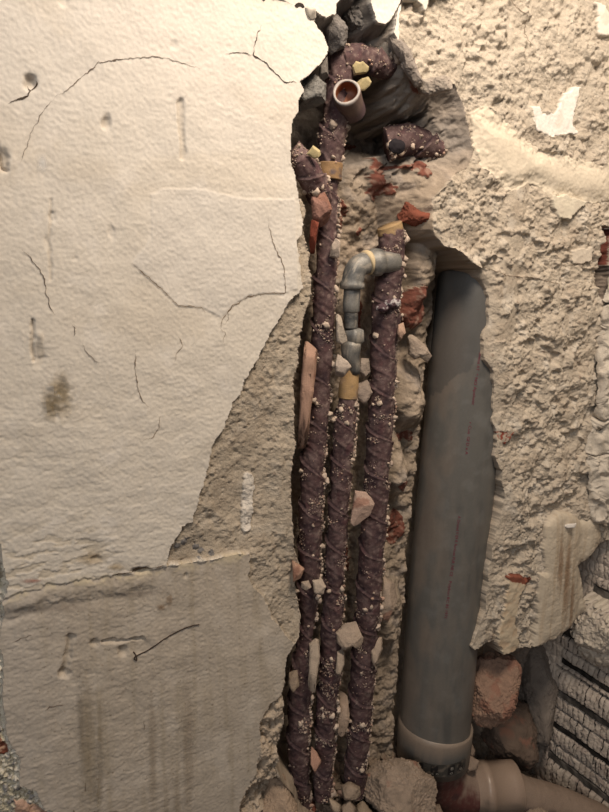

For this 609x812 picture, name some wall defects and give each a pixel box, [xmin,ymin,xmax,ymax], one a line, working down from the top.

crack [8,81,38,104]
crack [22,56,193,158]
crack [229,28,297,83]
flaking render [167,0,609,812]
flaking render [0,544,9,636]
flaking render [0,649,53,812]